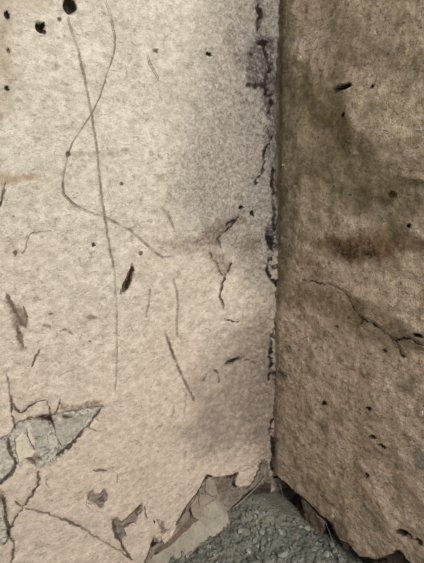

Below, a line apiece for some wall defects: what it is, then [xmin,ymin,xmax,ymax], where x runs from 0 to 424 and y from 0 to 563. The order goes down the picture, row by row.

crack [247,3,273,115]
water stain [298,70,354,143]
crack [255,129,278,286]
crack [209,216,239,322]
water stain [320,235,424,262]
crack [241,323,288,384]
flaking render [0,406,107,484]
crack [268,406,276,471]
crack [7,471,47,563]
flaking render [86,490,108,510]
peeling [112,461,335,563]
flaking render [358,550,412,563]